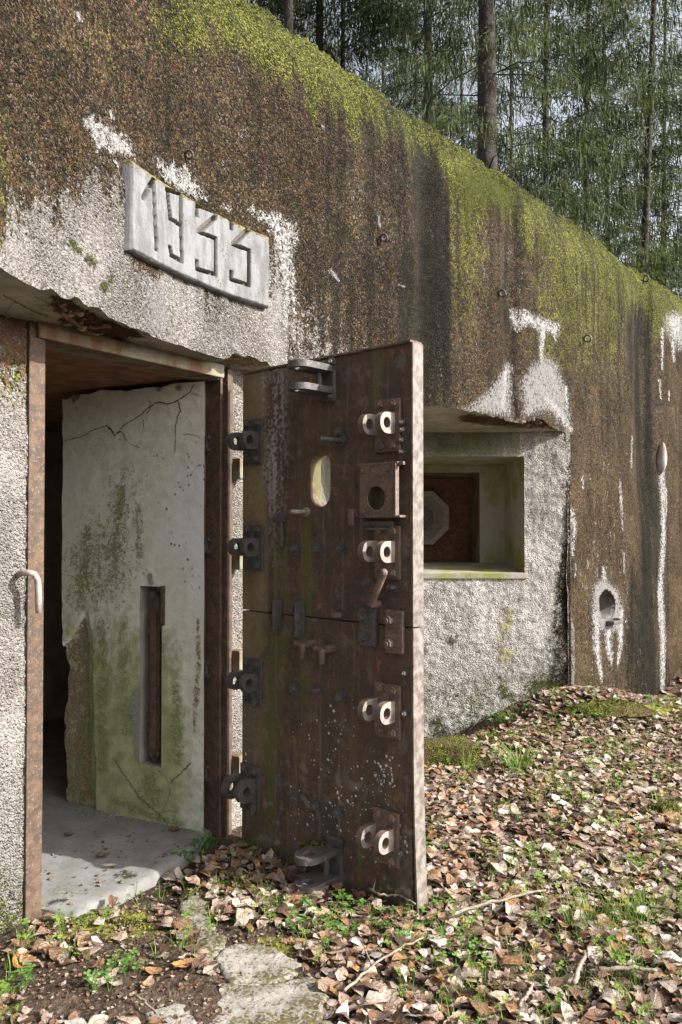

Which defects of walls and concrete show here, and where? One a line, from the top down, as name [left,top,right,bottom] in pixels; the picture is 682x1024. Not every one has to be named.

leakage [83,110,135,173]
leakage [156,157,207,201]
spalling [47,295,146,340]
leakage [461,195,573,432]
crack [65,384,201,452]
spalling [457,414,552,429]
leakage [591,285,682,696]
leakage [110,485,144,579]
flaking render [64,619,92,806]